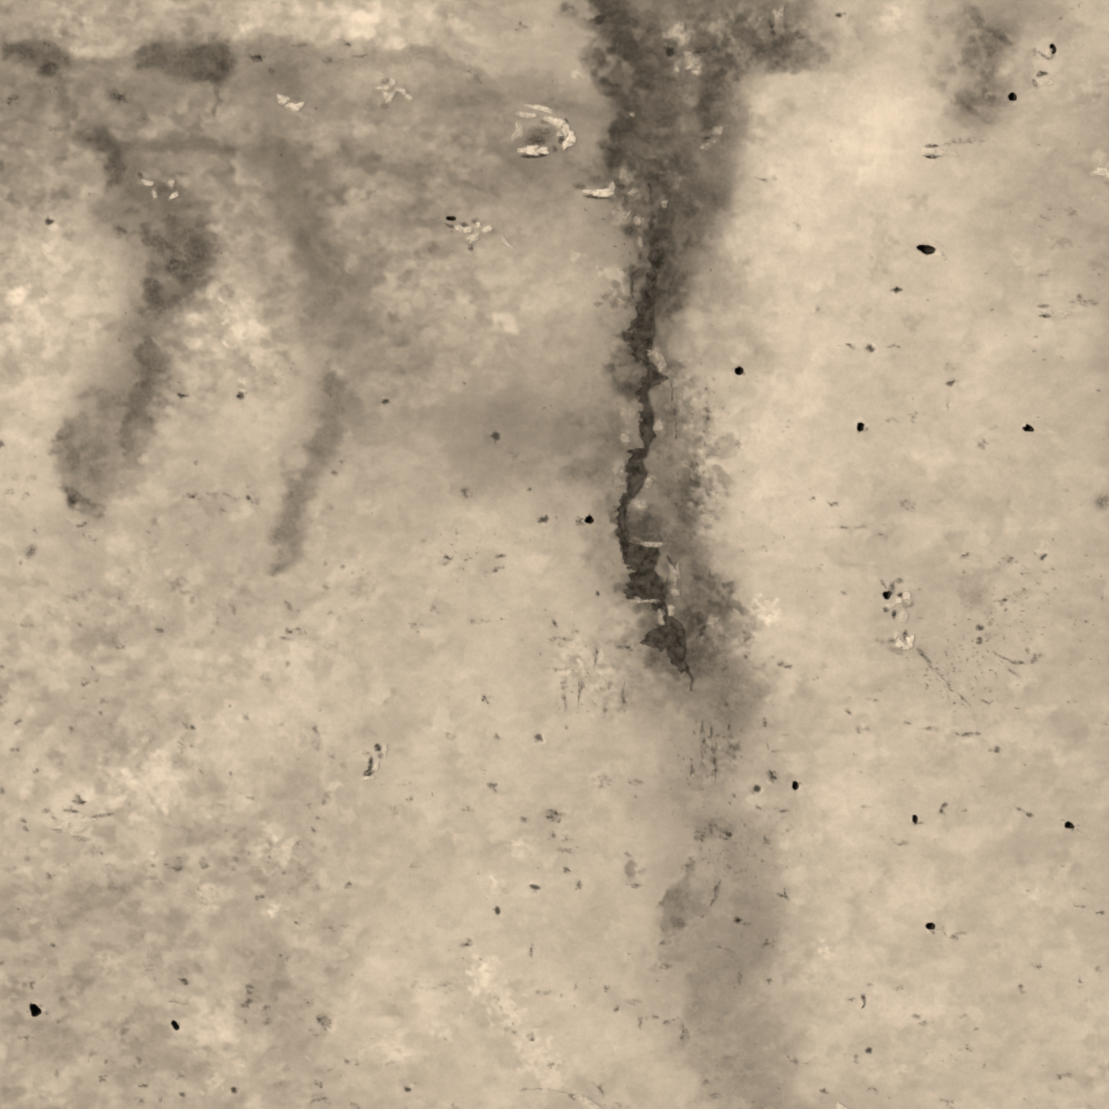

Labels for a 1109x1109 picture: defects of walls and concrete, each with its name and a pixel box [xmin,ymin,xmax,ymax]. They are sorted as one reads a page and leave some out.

crack [677,23,700,69]
crack [701,127,723,149]
crack [616,170,717,690]